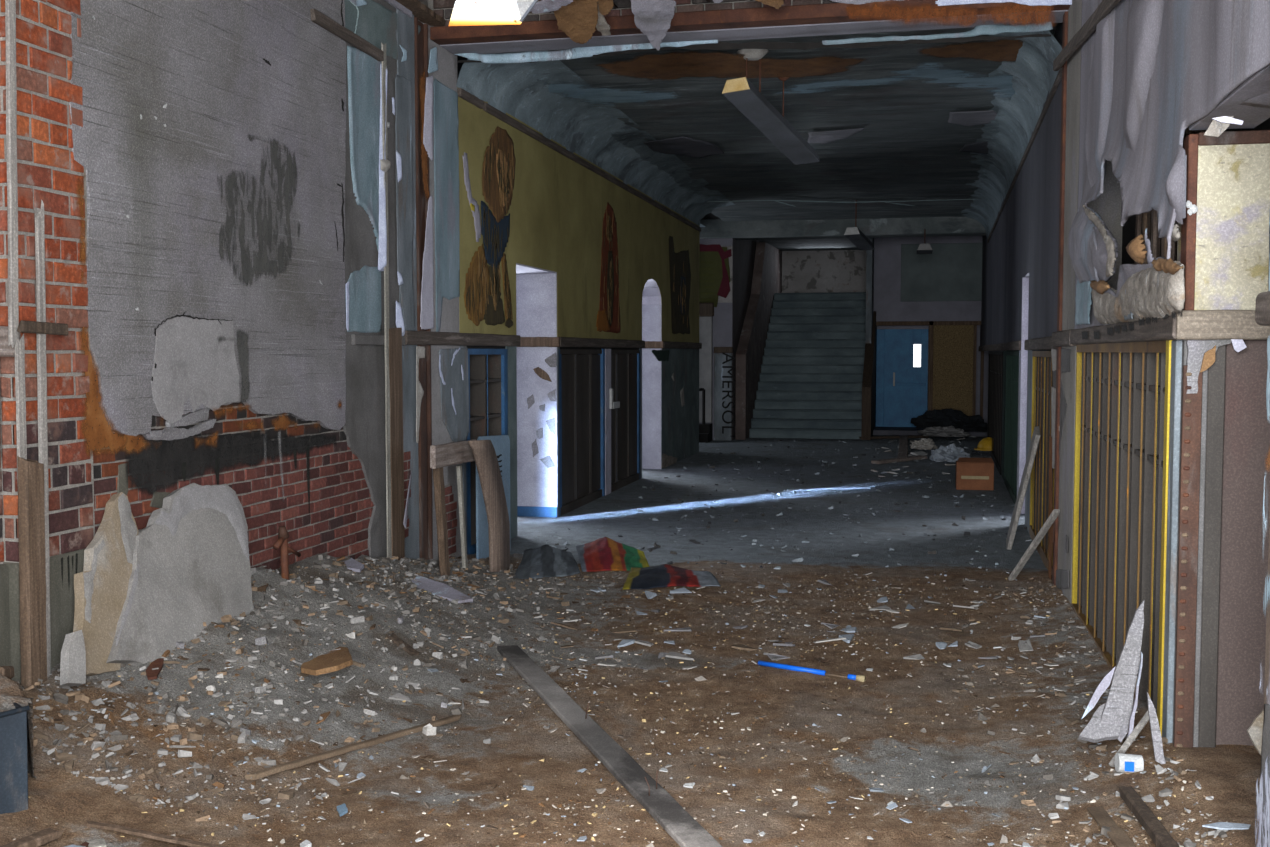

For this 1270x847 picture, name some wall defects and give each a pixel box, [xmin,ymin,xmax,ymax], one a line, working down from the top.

flaking render [455,0,718,63]
peeling [822,22,1053,45]
peeling [780,63,1015,126]
water stain [219,140,300,285]
peeling [344,0,438,336]
peeling [462,153,482,242]
flaking render [1075,201,1198,325]
flaking render [143,408,216,441]
water stain [280,445,310,514]
peeling [403,346,464,538]
peeling [527,352,557,468]
peeling [1202,681,1270,847]